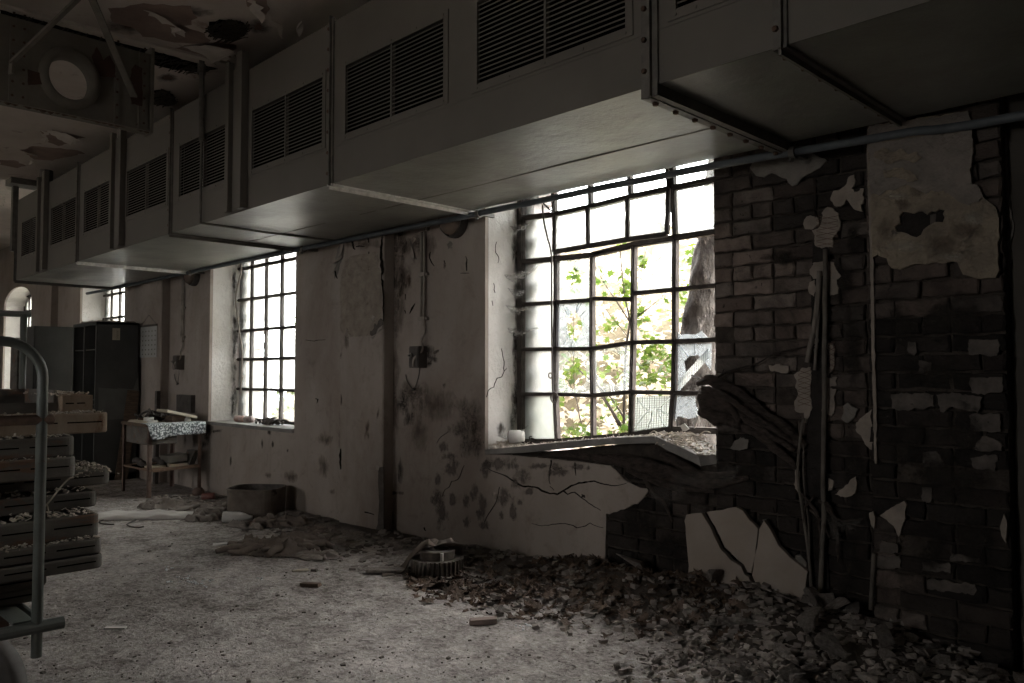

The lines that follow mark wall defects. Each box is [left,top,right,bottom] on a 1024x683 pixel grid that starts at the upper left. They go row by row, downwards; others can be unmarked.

peeling [108,3,237,69]
flaking render [896,210,944,237]
flaking render [968,339,1000,357]
damp [498,381,517,435]
flaking render [891,377,1004,472]
damp [432,409,589,529]
crack [484,460,628,528]
flaking render [922,553,977,595]